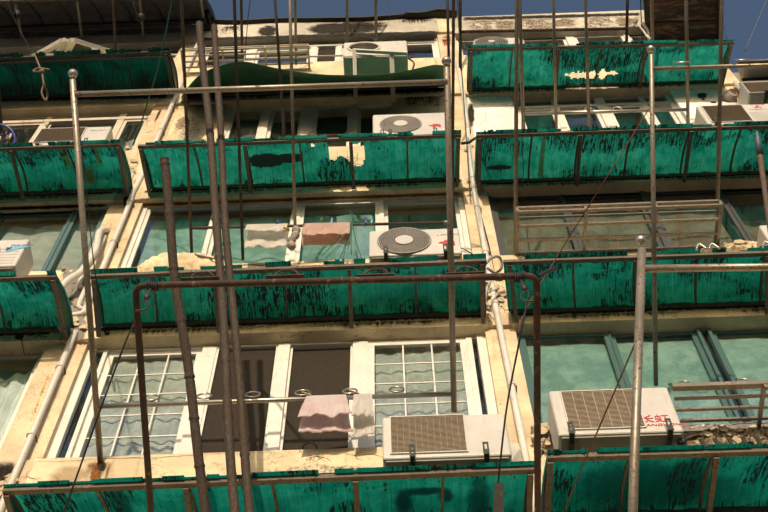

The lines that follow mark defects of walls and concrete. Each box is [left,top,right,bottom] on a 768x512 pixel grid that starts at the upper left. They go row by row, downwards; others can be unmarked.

leakage [204,18,435,41]
rust [88,462,110,481]
peeling [0,473,20,499]